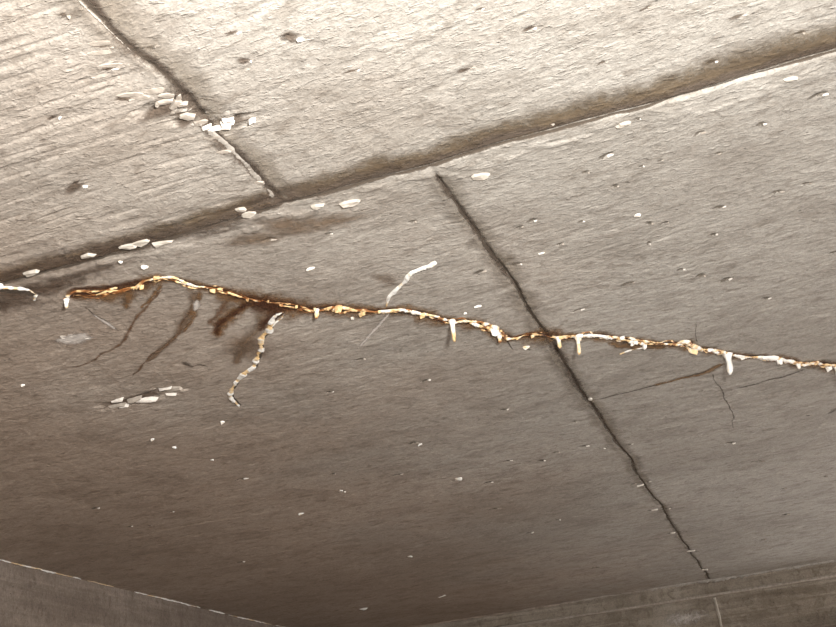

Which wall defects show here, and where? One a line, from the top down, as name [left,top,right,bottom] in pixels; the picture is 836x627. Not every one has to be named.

spalling [115,87,256,141]
crack [0,283,38,301]
crack [63,261,836,424]
spalling [108,386,183,409]